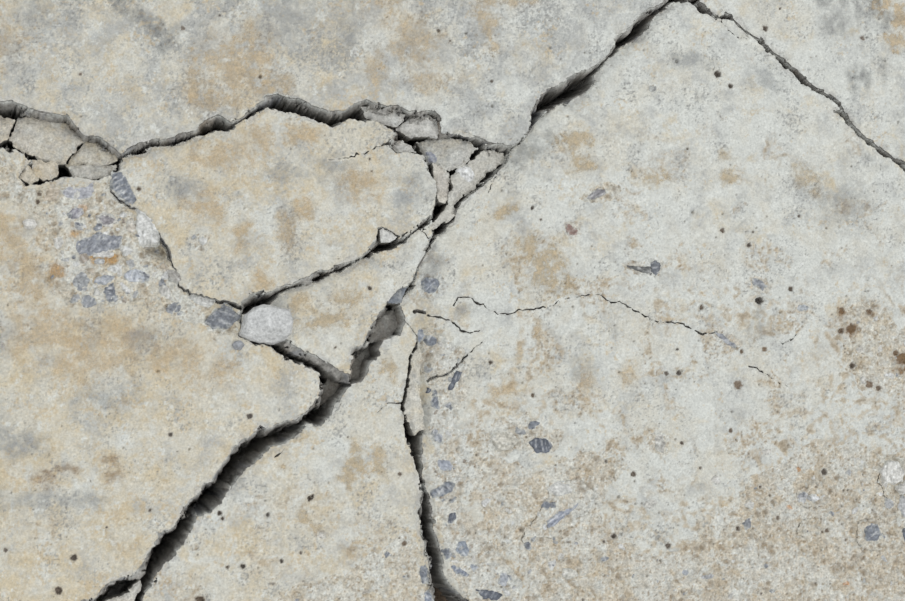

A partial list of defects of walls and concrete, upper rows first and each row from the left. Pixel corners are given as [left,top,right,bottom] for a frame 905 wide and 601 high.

spalling [0,152,242,341]
crack [81,297,418,601]
crack [378,402,468,601]
crack [413,309,479,334]
crack [0,0,905,326]
crack [427,342,482,382]